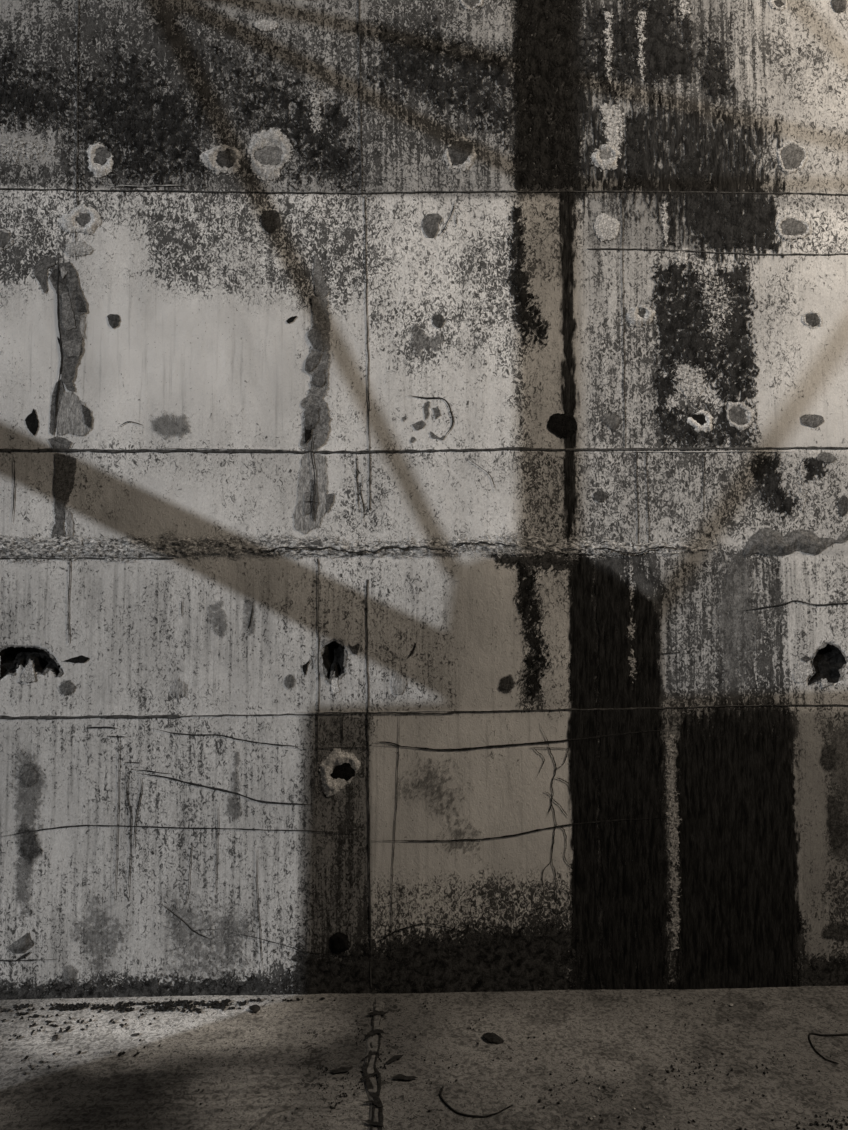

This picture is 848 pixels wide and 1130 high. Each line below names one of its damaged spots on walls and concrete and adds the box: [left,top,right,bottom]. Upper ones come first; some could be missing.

spalling [86,142,113,178]
leakage [0,38,375,205]
spalling [200,128,293,183]
leakage [358,0,829,519]
peeling [25,253,92,546]
peeling [293,254,334,534]
spalling [0,645,89,683]
spalling [302,639,360,695]
spalling [319,748,362,797]
leakage [0,431,848,1000]
spalling [793,643,848,688]
crack [329,1001,418,1130]